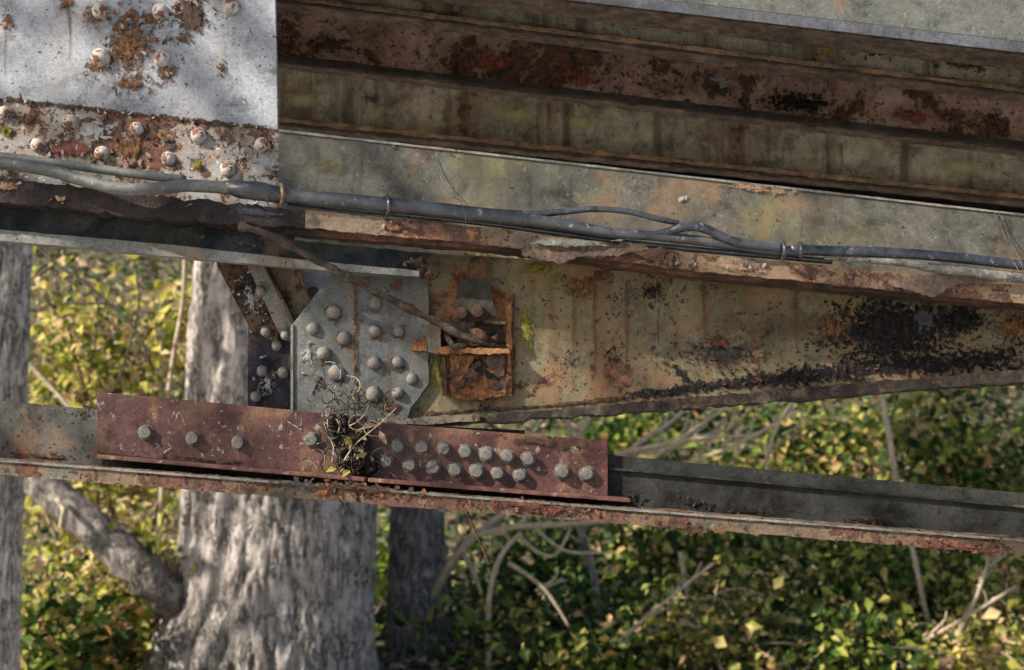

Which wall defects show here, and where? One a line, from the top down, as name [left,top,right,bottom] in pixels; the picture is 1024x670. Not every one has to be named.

corrosion [295,32,355,58]
corrosion [0,0,267,144]
corrosion [930,60,999,73]
corrosion [744,86,877,120]
corrosion [421,273,1024,416]
corrosion [728,504,770,516]
corrosion [841,516,910,527]